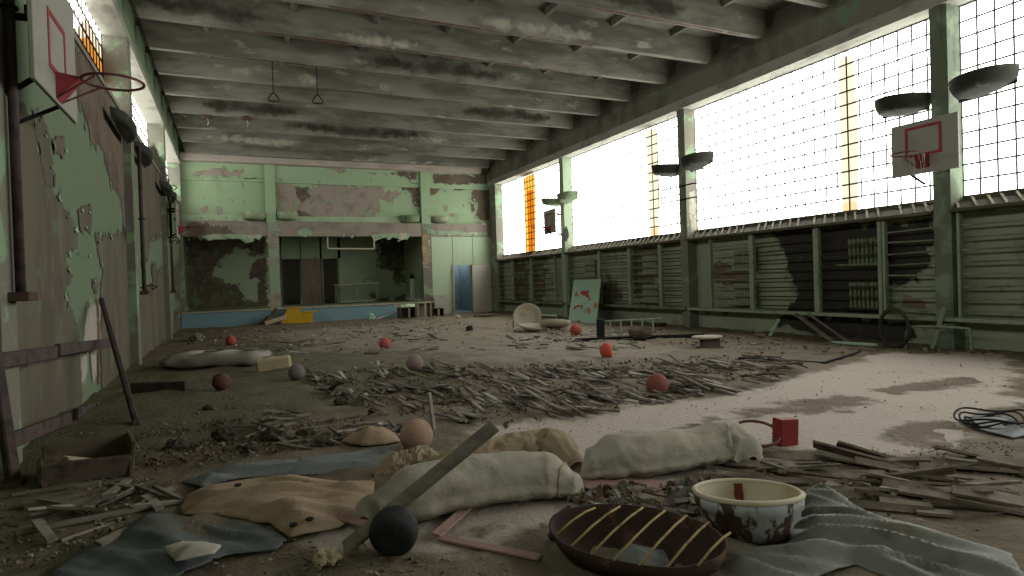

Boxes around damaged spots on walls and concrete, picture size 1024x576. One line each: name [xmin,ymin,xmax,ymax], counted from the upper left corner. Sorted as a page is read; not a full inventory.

leakage [348,34,495,77]
leakage [465,108,549,121]
peeling [275,168,431,268]
peeling [430,188,490,226]
peeling [16,102,181,428]
leakage [733,377,980,417]
leakage [883,421,980,447]